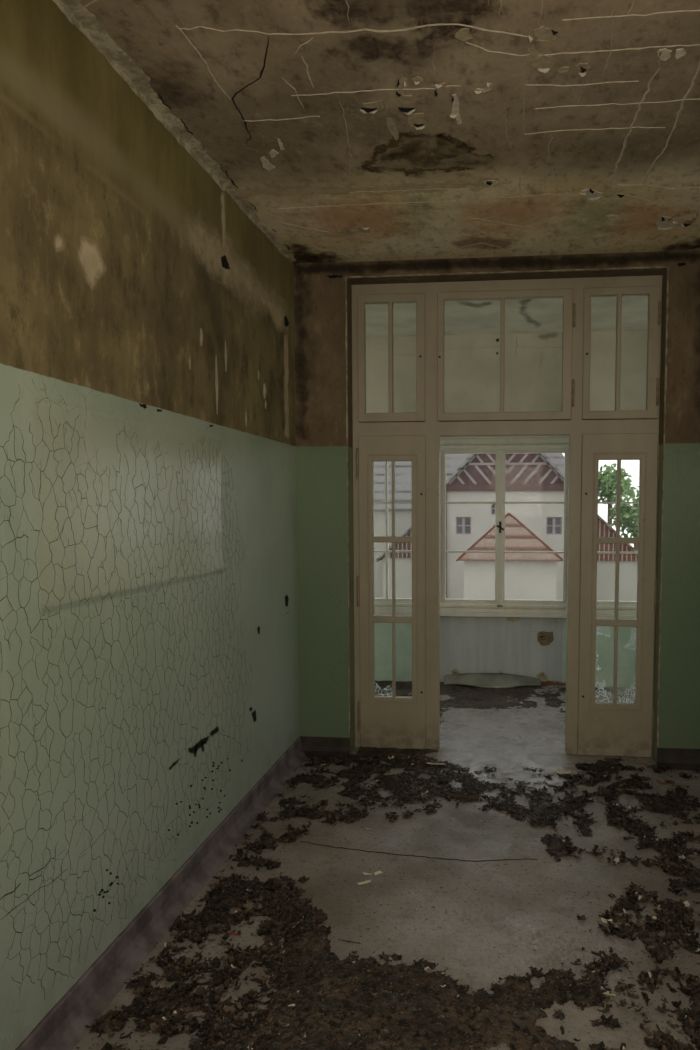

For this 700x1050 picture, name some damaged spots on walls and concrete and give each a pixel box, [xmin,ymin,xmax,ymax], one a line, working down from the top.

leakage [347,0,493,63]
peeling [360,76,462,140]
leakage [358,133,494,176]
crack [176,0,700,242]
leakage [189,221,700,338]
leakage [215,341,227,414]
crack [0,380,251,995]
peeling [168,758,231,836]